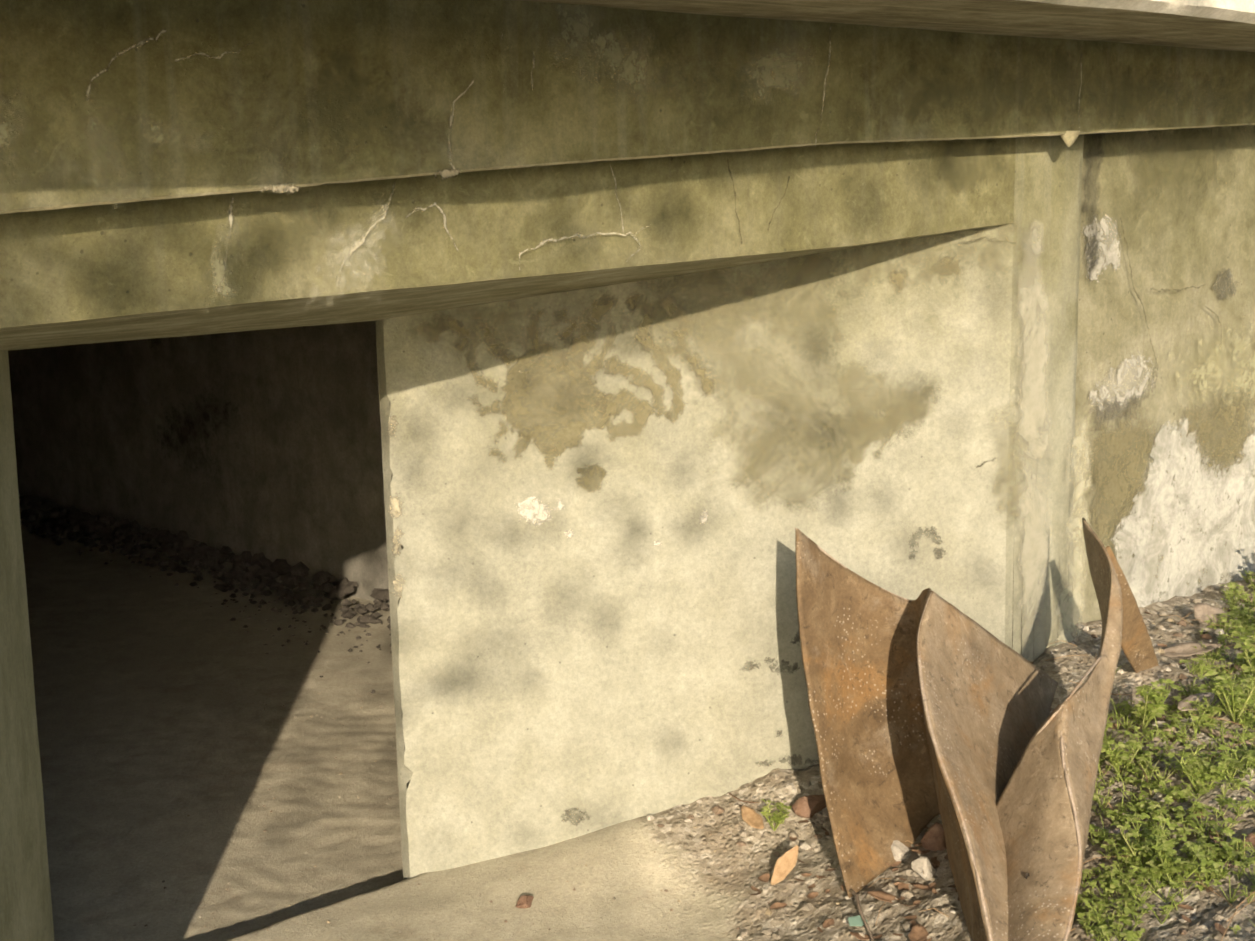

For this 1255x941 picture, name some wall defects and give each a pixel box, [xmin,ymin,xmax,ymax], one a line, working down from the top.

crack [87,30,240,96]
crack [450,81,474,169]
crack [338,197,458,279]
crack [519,165,641,270]
peeling [1083,215,1121,283]
leakage [423,294,714,468]
peeling [1179,329,1255,406]
spalling [517,497,564,526]
leakage [577,465,606,492]
peeling [1058,352,1157,645]
peeling [1111,417,1255,608]